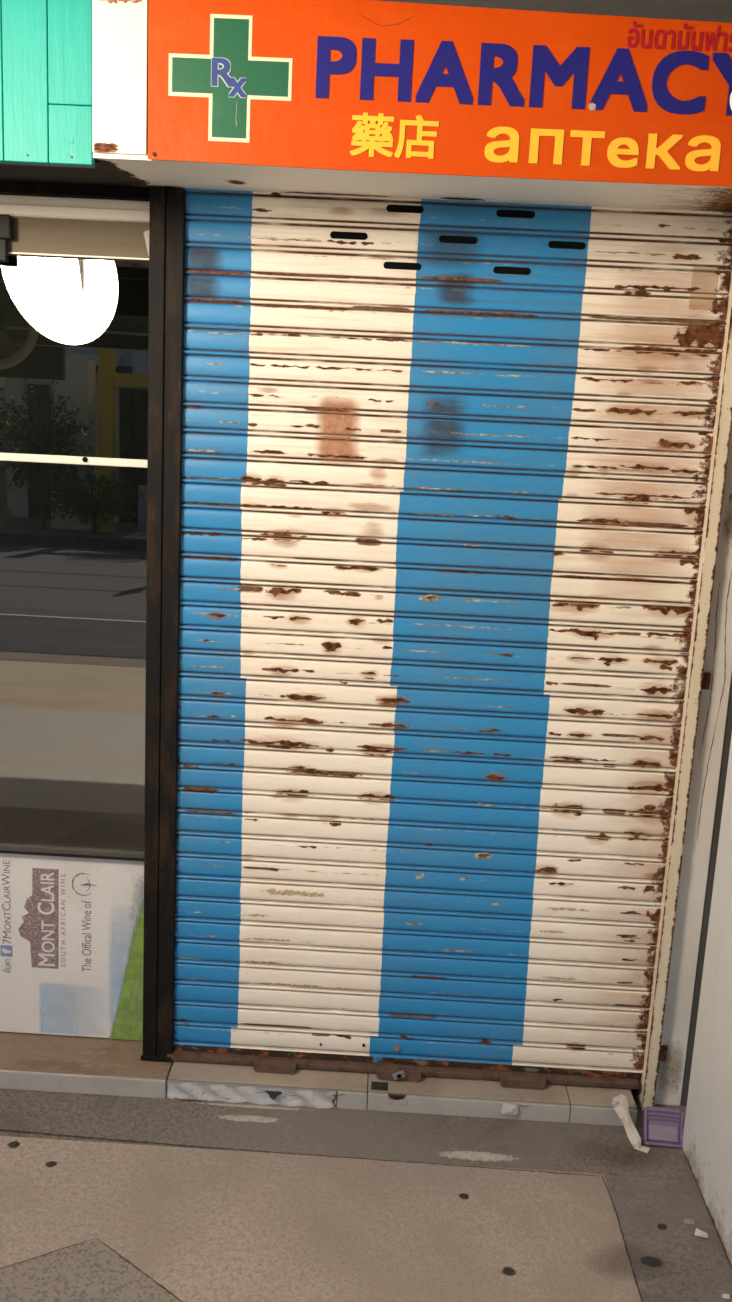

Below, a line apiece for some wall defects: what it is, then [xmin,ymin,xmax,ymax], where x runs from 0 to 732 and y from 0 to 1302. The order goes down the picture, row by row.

rust [292,403,366,459]
rust [241,476,328,487]
rust [185,502,344,516]
rust [241,530,306,541]
rust [356,537,381,546]
rust [238,585,302,597]
rust [324,589,361,597]
rust [321,642,341,652]
rust [549,213,732,1106]
rust [264,716,343,725]
rust [212,739,334,752]
rust [288,766,362,777]